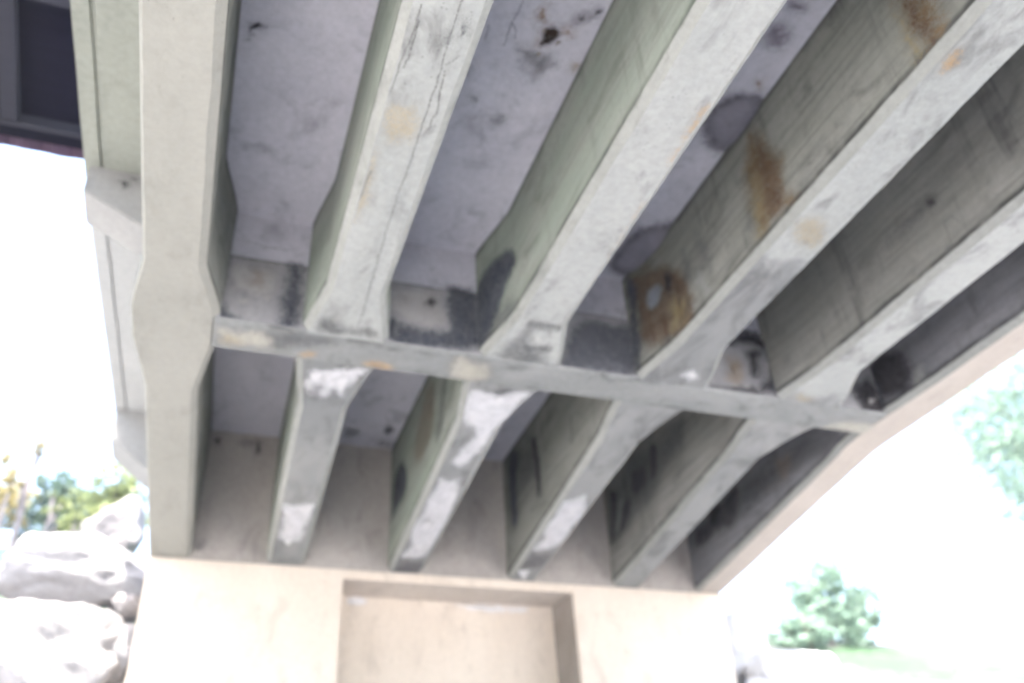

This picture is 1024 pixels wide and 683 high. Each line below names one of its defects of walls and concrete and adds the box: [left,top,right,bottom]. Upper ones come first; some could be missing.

crack [357,0,523,330]
leakage [214,247,636,527]
rust [625,260,696,369]